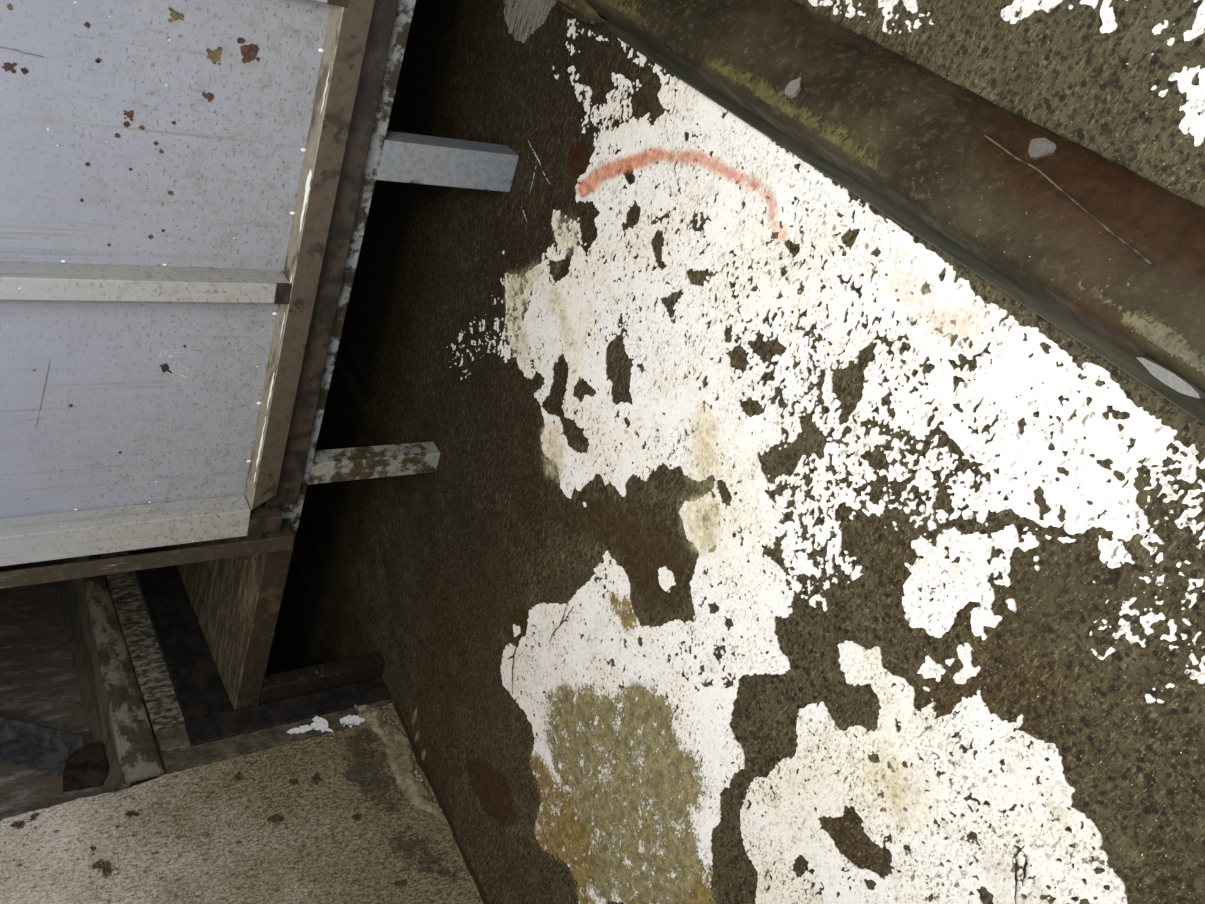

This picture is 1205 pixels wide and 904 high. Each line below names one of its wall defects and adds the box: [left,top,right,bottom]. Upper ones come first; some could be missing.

corrosion [168,7,184,23]
flaking render [504,0,557,43]
peeling [808,0,934,35]
peeling [1001,0,1129,34]
peeling [1152,0,1205,46]
corrosion [2,49,44,74]
corrosion [206,47,222,65]
corrosion [237,37,260,63]
corrosion [115,110,145,138]
corrosion [570,144,758,196]
peeling [447,18,1205,904]
leakage [529,684,715,904]